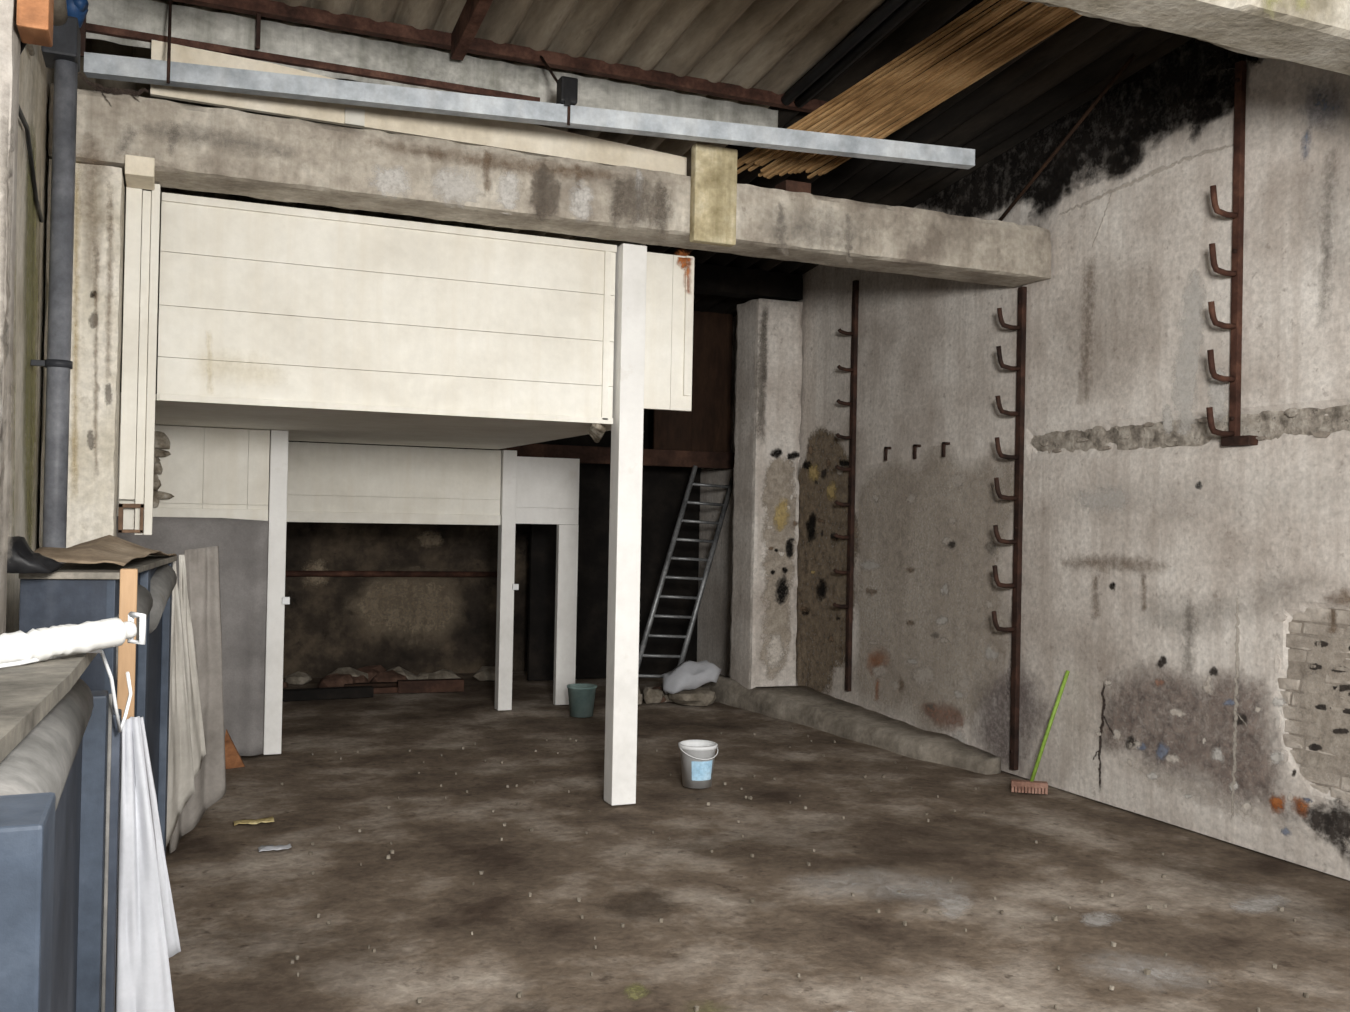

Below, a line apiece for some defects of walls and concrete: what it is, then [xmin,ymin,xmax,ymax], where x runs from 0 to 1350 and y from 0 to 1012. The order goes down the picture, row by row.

spalling [1030,274,1350,453]
peeling [760,429,860,692]
peeling [1096,597,1350,814]
leakage [1297,799,1350,855]